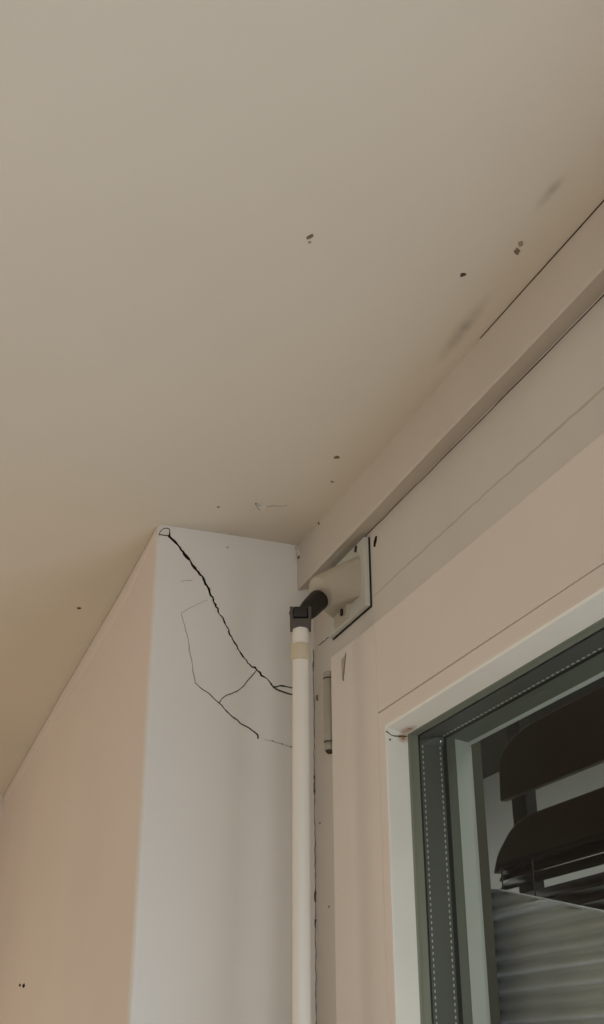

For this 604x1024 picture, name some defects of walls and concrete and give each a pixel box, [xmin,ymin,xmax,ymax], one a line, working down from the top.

crack [168,531,329,1024]